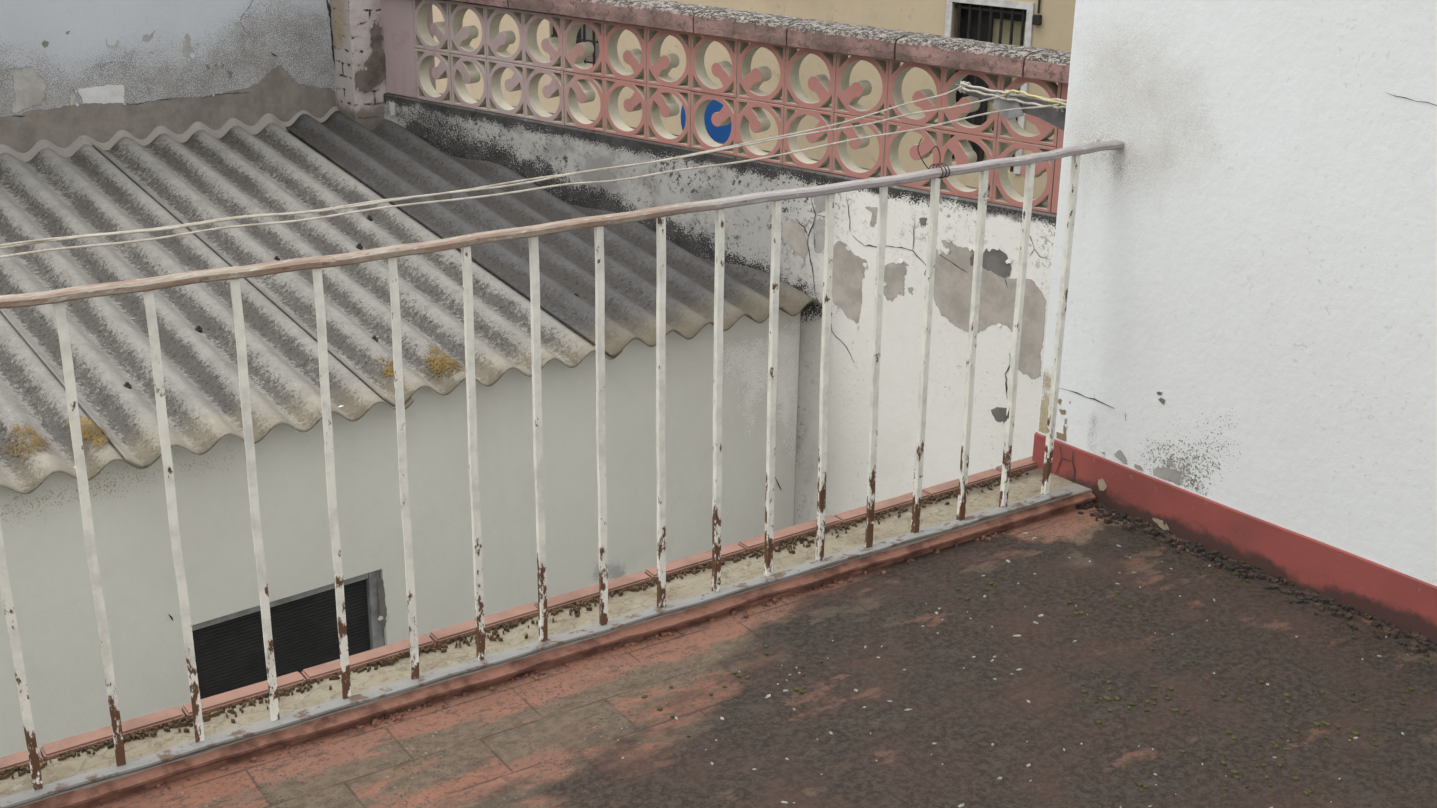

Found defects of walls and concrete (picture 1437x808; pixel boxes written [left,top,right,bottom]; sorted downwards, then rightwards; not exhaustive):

peeling [0,33,336,153]
damp [0,0,349,117]
spalling [355,15,386,92]
damp [383,0,1265,468]
peeling [813,195,867,328]
peeling [865,207,877,227]
peeling [883,259,913,302]
peeling [933,238,1046,379]
damp [1127,406,1240,496]